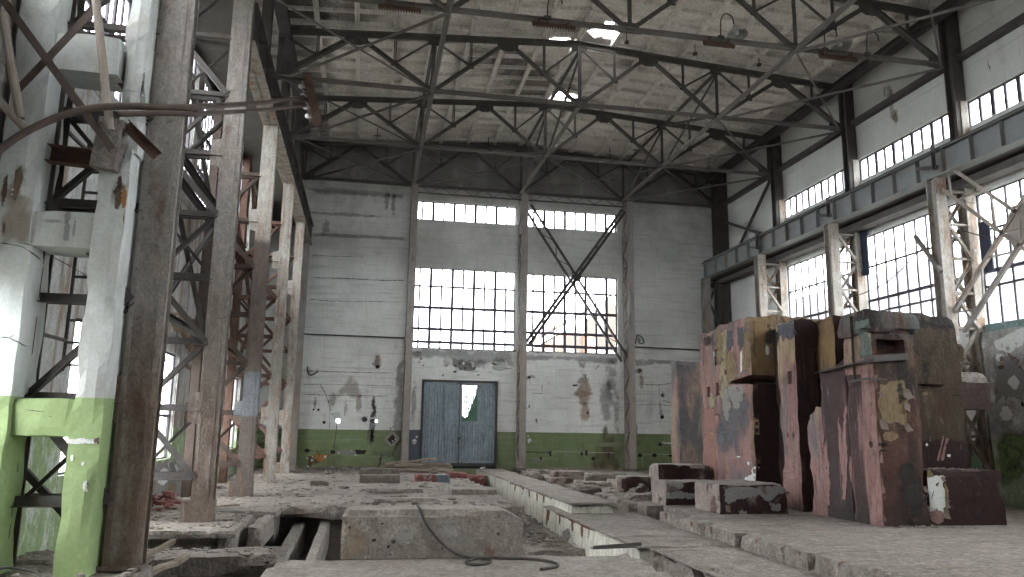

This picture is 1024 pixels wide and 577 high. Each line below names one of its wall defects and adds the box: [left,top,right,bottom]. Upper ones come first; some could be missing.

spalling [1,166,23,206]
spalling [113,157,130,210]
peeling [442,358,479,377]
peeling [993,354,1024,421]
peeling [869,374,929,525]
peeling [923,470,951,524]